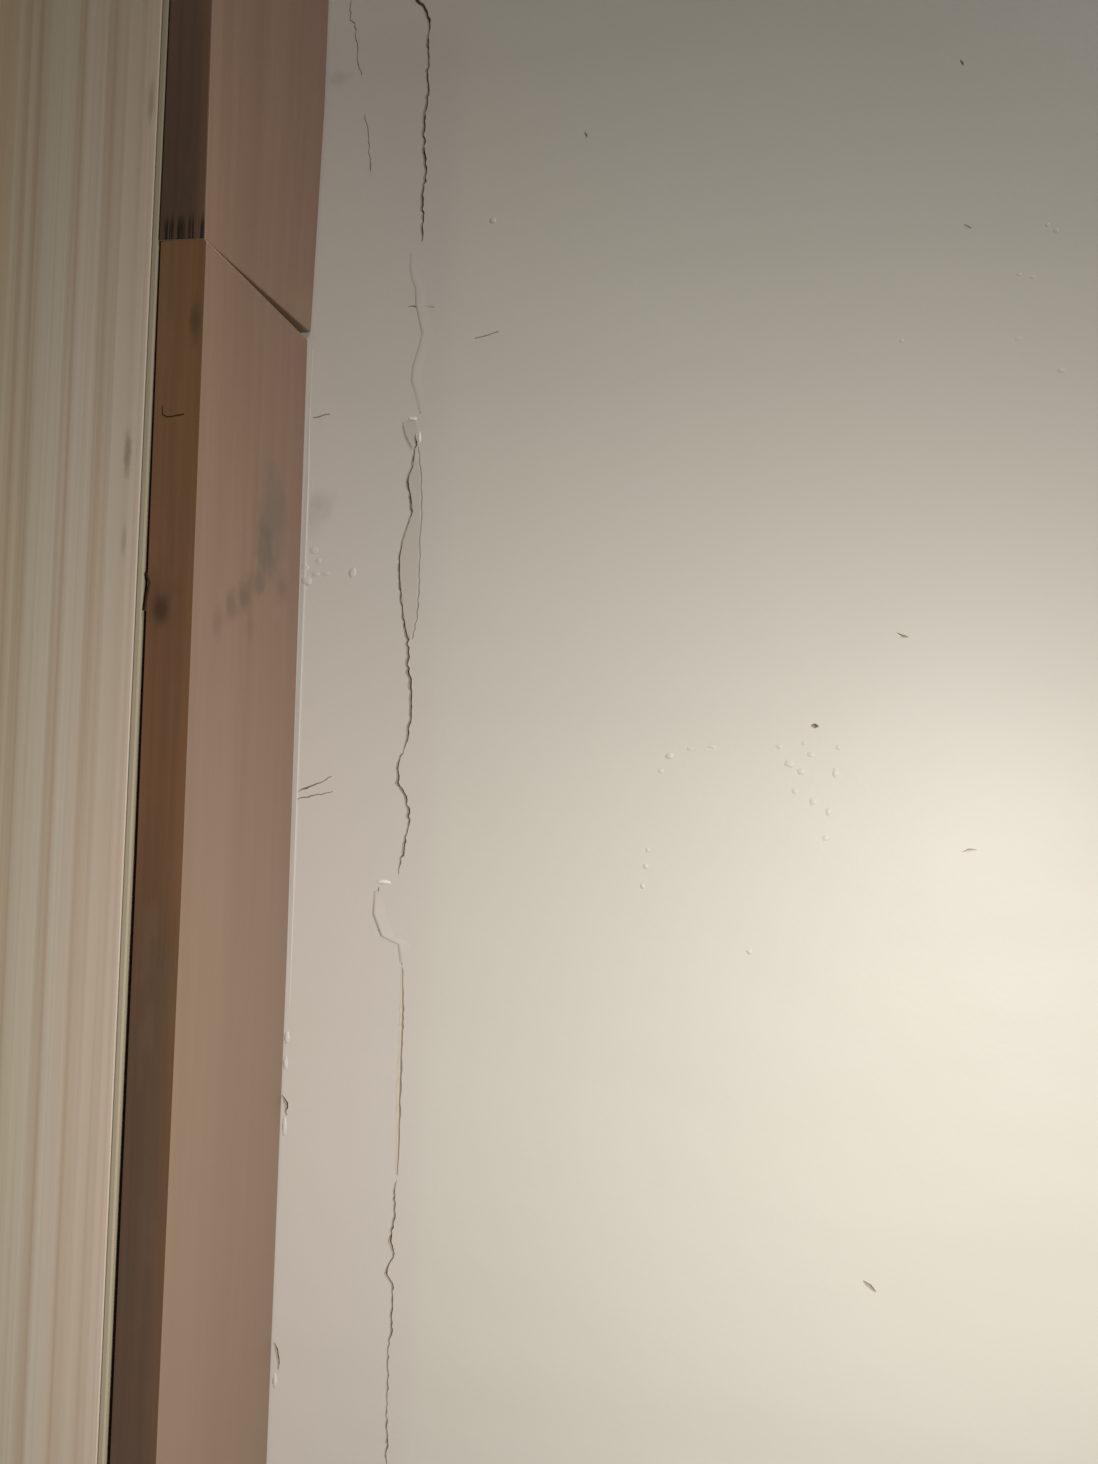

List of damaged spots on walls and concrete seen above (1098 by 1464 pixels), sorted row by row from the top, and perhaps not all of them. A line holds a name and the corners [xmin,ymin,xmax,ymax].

crack [349,2,362,75]
crack [411,0,431,268]
crack [377,407,423,891]
crack [378,930,404,1464]